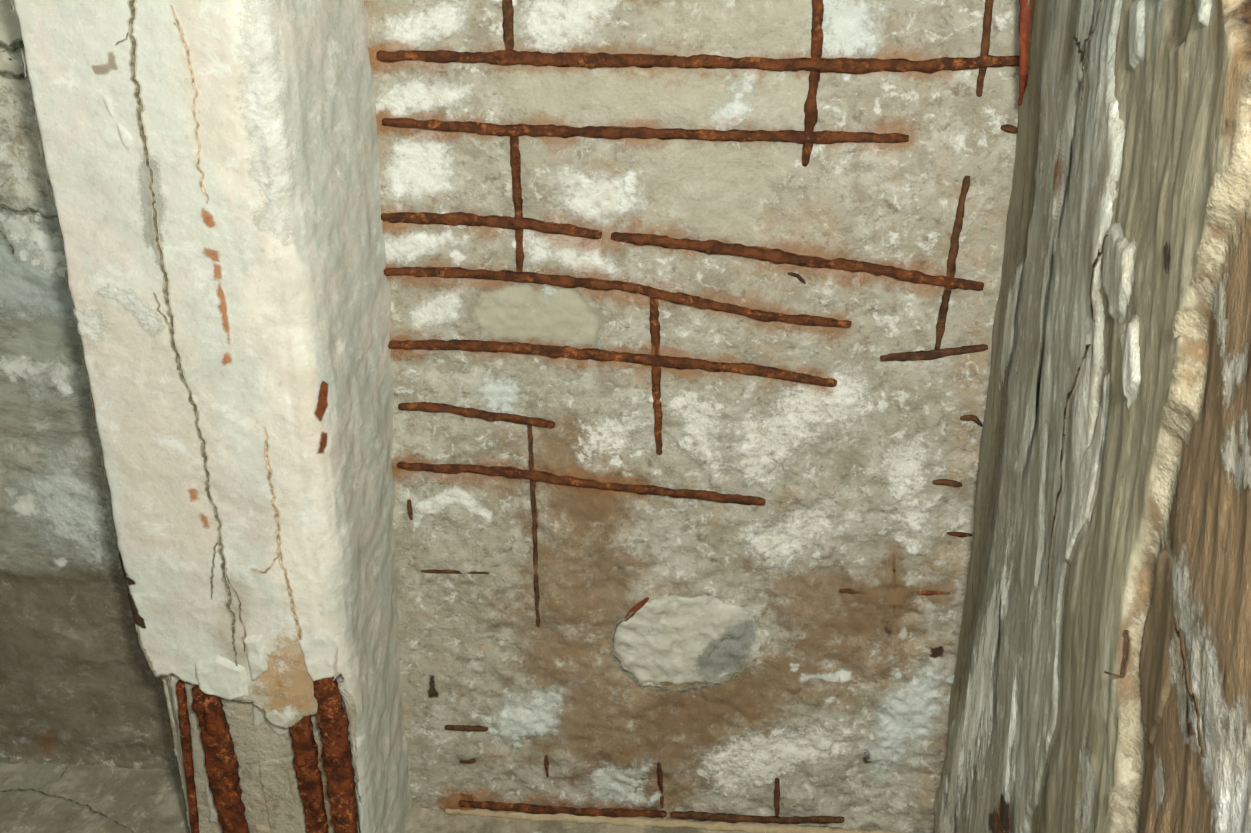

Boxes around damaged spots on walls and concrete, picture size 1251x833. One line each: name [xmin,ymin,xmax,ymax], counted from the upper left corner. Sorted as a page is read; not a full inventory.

crack [0,0,63,254]
crack [65,269,115,538]
rust [202,209,214,227]
crack [115,0,304,667]
rust [204,249,229,337]
peeling [469,283,603,348]
flaking render [933,0,1170,833]
crack [1045,234,1108,609]
flaking render [1108,0,1251,833]
spalling [119,552,335,833]
rust [259,638,317,715]
water stain [696,517,1019,833]